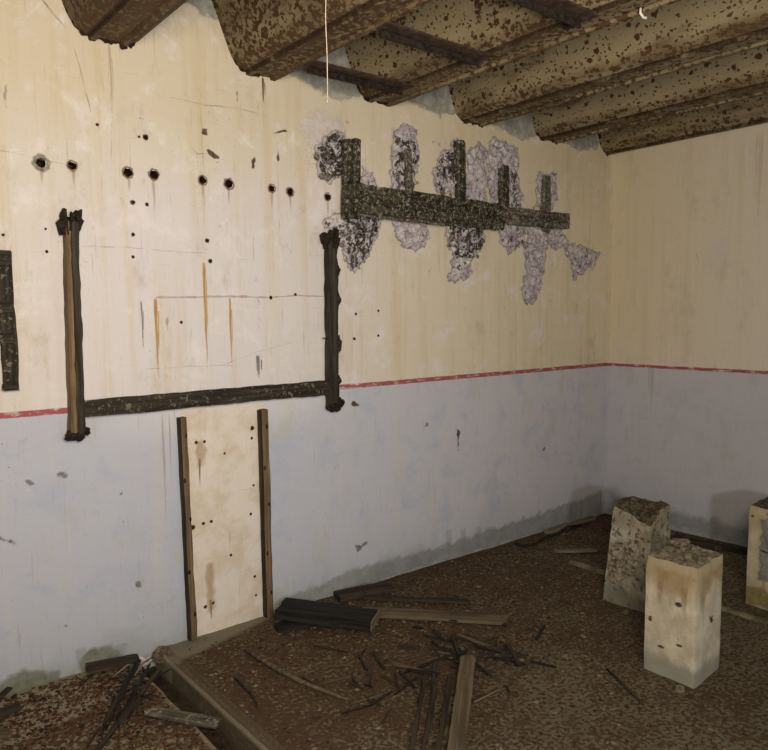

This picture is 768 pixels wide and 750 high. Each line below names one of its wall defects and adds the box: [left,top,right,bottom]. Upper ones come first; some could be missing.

corrosion [65,7,136,50]
peeling [361,165,378,187]
peeling [389,123,420,191]
peeling [466,113,536,208]
peeling [533,171,559,210]
peeling [392,220,430,251]
peeling [521,226,601,305]
leakage [294,492,602,600]